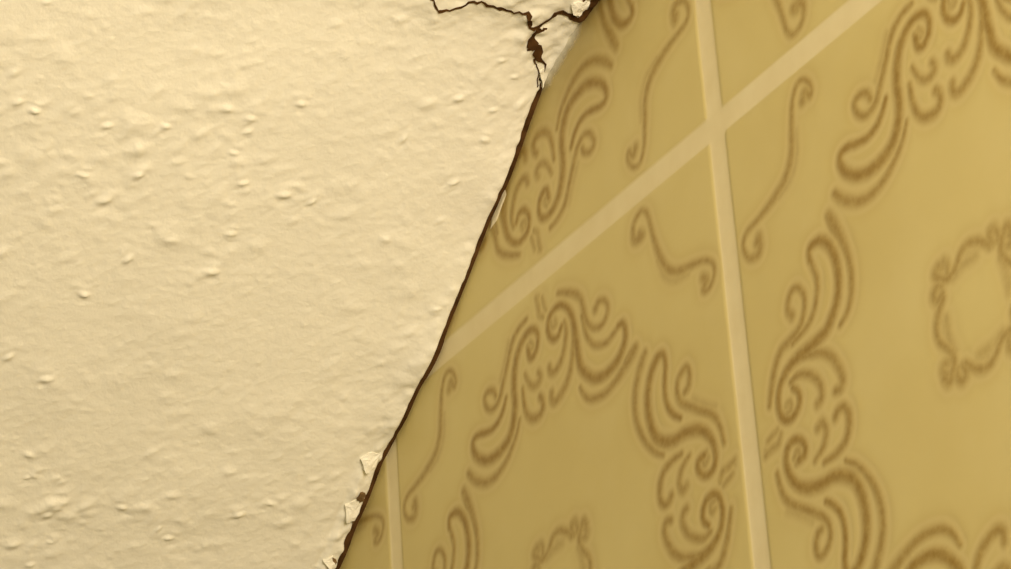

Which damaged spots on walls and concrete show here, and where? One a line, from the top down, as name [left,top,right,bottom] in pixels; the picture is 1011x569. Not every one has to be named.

peeling [571,1,590,17]
peeling [490,191,506,229]
crack [336,0,599,569]
peeling [360,452,380,474]
peeling [344,492,366,525]
peeling [323,555,337,569]